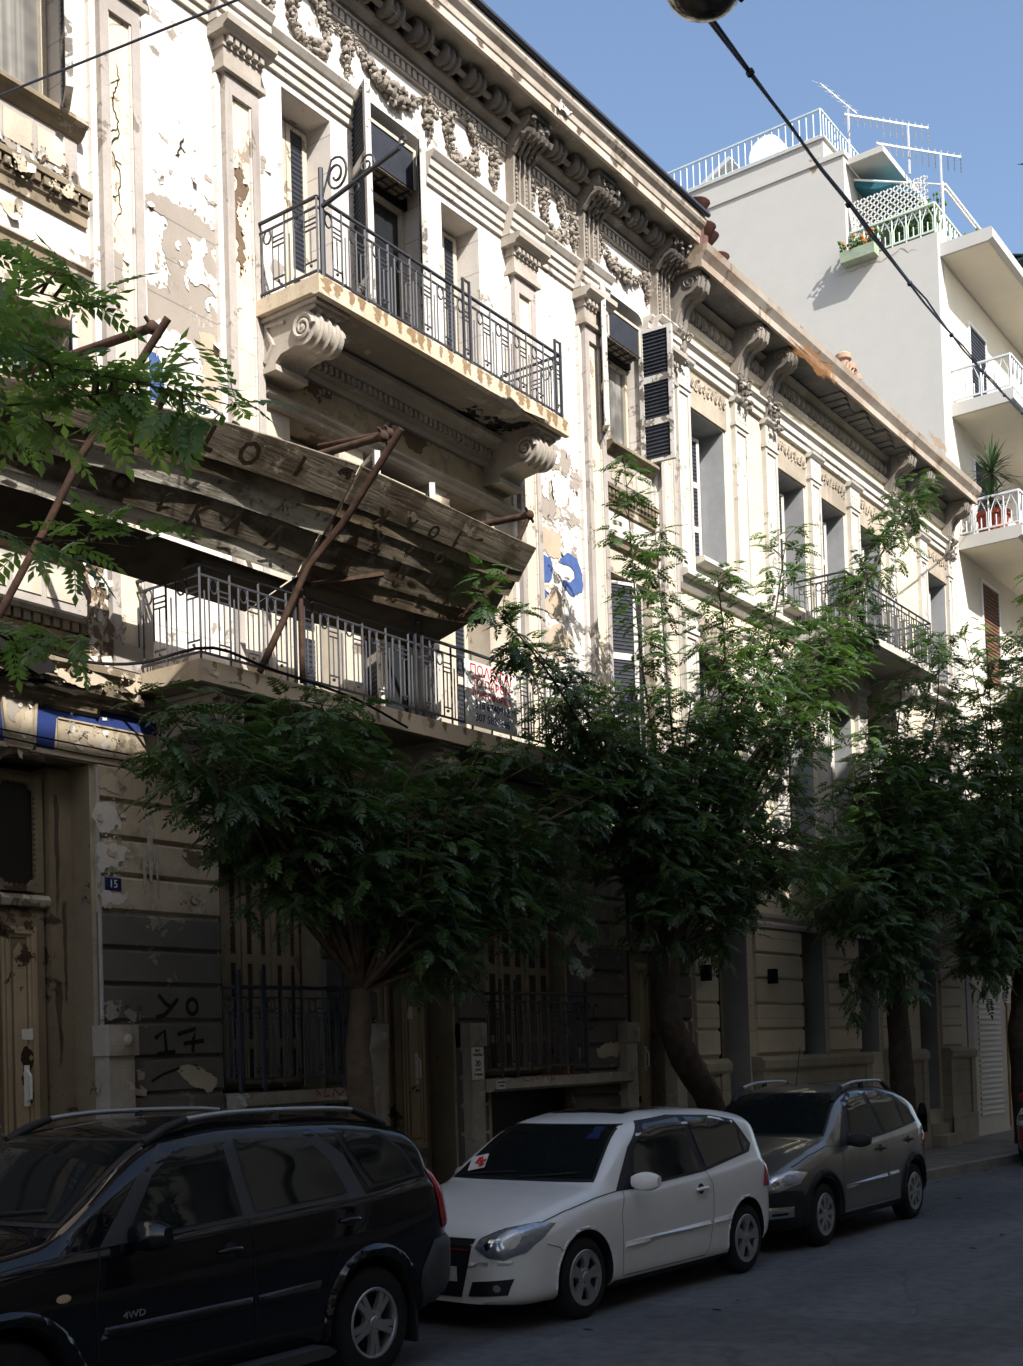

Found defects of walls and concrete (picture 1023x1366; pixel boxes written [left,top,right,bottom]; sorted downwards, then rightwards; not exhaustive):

spalling [0,129,80,199]
crack [110,61,122,221]
peeling [0,193,24,220]
peeling [234,155,272,274]
peeling [114,242,131,314]
peeling [145,168,219,409]
peeling [264,259,285,293]
peeling [457,405,533,432]
peeling [541,444,583,661]
peeling [16,562,143,694]
spalling [177,1063,217,1093]